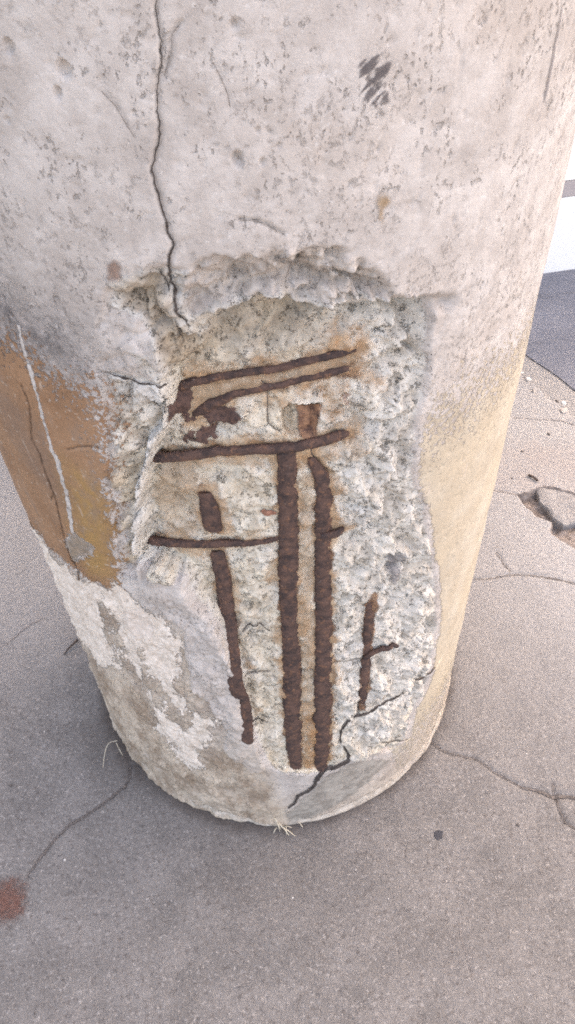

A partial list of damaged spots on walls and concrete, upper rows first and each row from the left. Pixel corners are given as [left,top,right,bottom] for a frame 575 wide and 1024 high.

crack [102,0,187,338]
damp [17,325,93,563]
spalling [30,239,440,776]
rust [155,319,382,766]
crack [288,667,436,809]